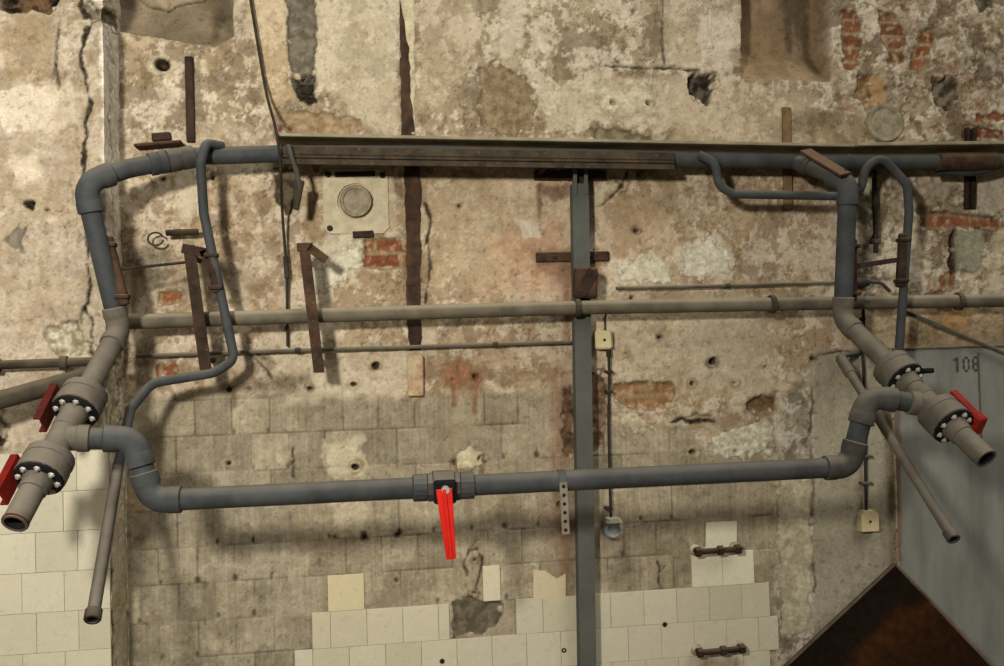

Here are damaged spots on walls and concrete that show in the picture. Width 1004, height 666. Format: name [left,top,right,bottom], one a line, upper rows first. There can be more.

flaking render [2,0,60,15]
crack [55,0,99,174]
flaking render [274,0,365,138]
flaking render [687,71,720,106]
flaking render [839,7,873,105]
flaking render [877,7,933,71]
flaking render [920,210,1001,293]
flaking render [592,369,675,451]
flaking render [703,395,775,462]
spalling [705,521,737,548]
flaking render [452,595,504,636]
spalling [533,570,566,600]